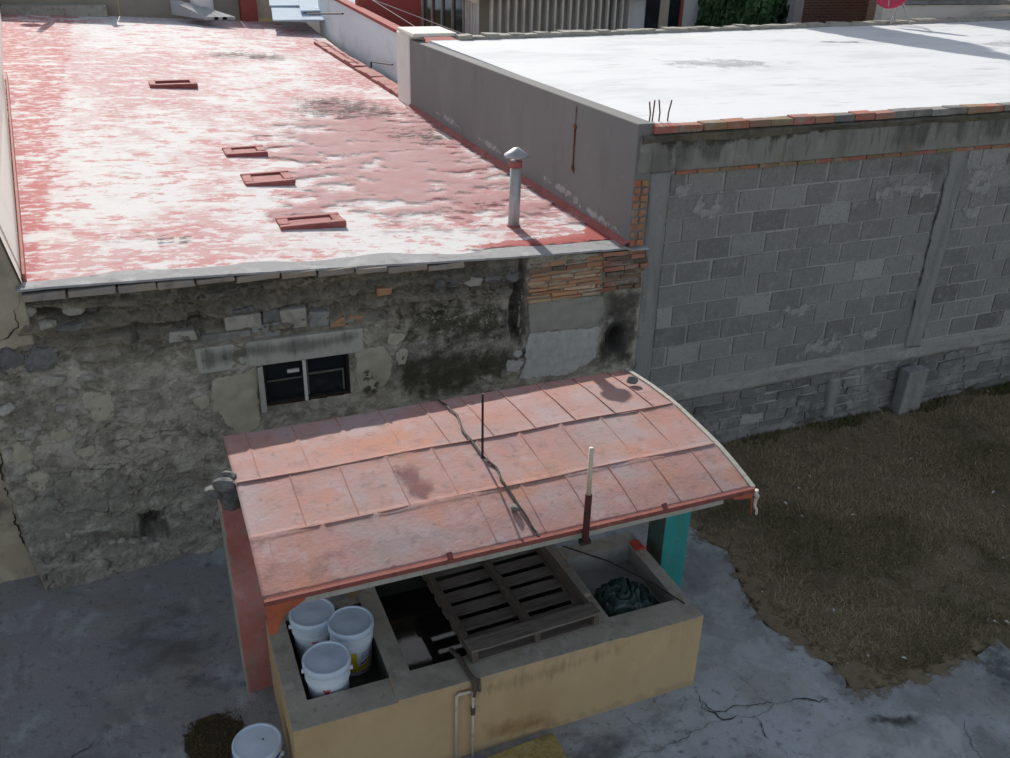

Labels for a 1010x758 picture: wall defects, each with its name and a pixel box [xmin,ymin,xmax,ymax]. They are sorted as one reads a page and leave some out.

crack [0,454,36,573]
crack [626,666,843,758]